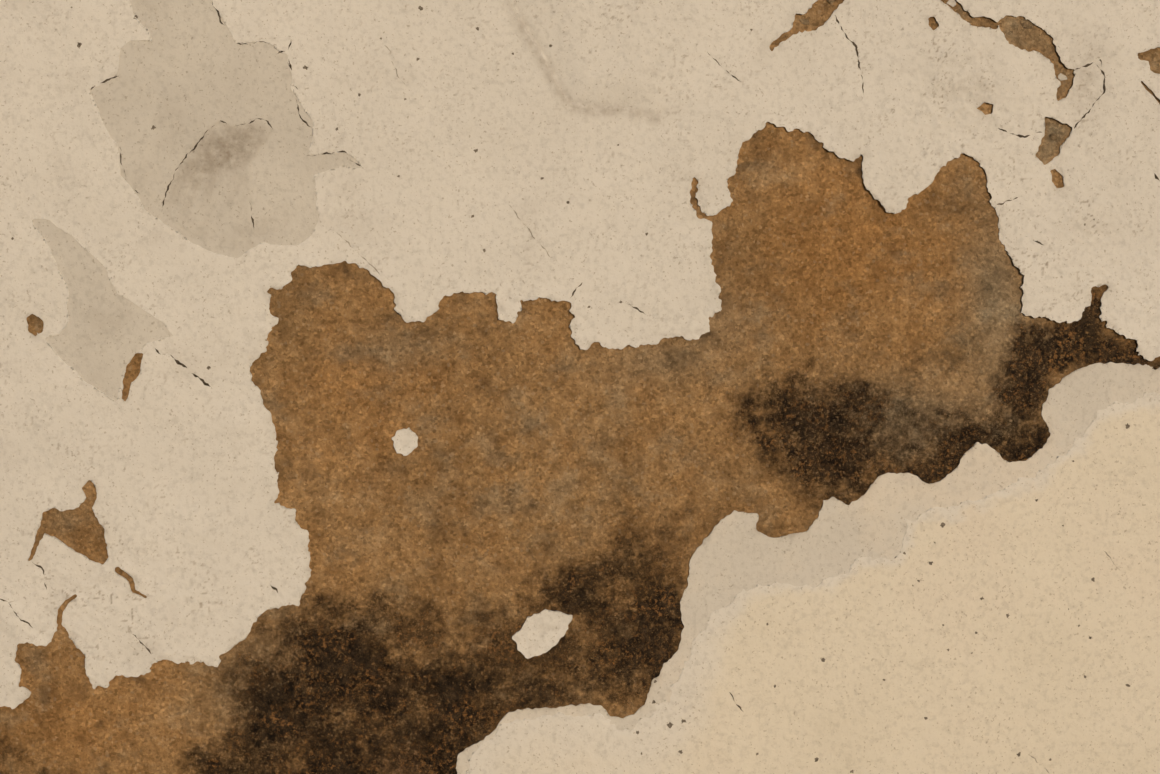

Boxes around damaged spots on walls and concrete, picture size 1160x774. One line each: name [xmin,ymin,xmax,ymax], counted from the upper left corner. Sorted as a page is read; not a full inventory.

peeling [769,0,1054,214]
spalling [1138,47,1160,100]
peeling [995,197,1108,345]
peeling [0,117,1091,774]
damp [736,290,1160,505]
damp [185,519,684,774]